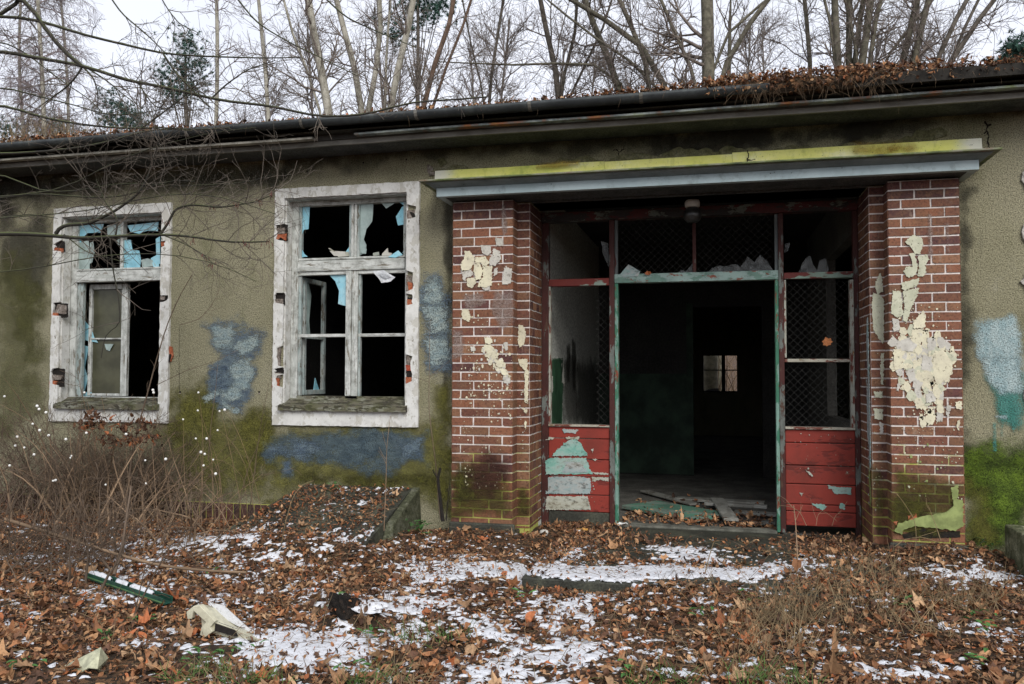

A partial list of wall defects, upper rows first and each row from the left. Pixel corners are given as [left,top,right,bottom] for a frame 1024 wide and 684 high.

crack [983,121,992,148]
peeling [458,237,512,295]
peeling [459,309,529,454]
peeling [866,235,962,511]
damp [961,310,972,376]
peeling [545,358,609,510]
peeling [812,485,851,510]
peeling [893,481,964,539]